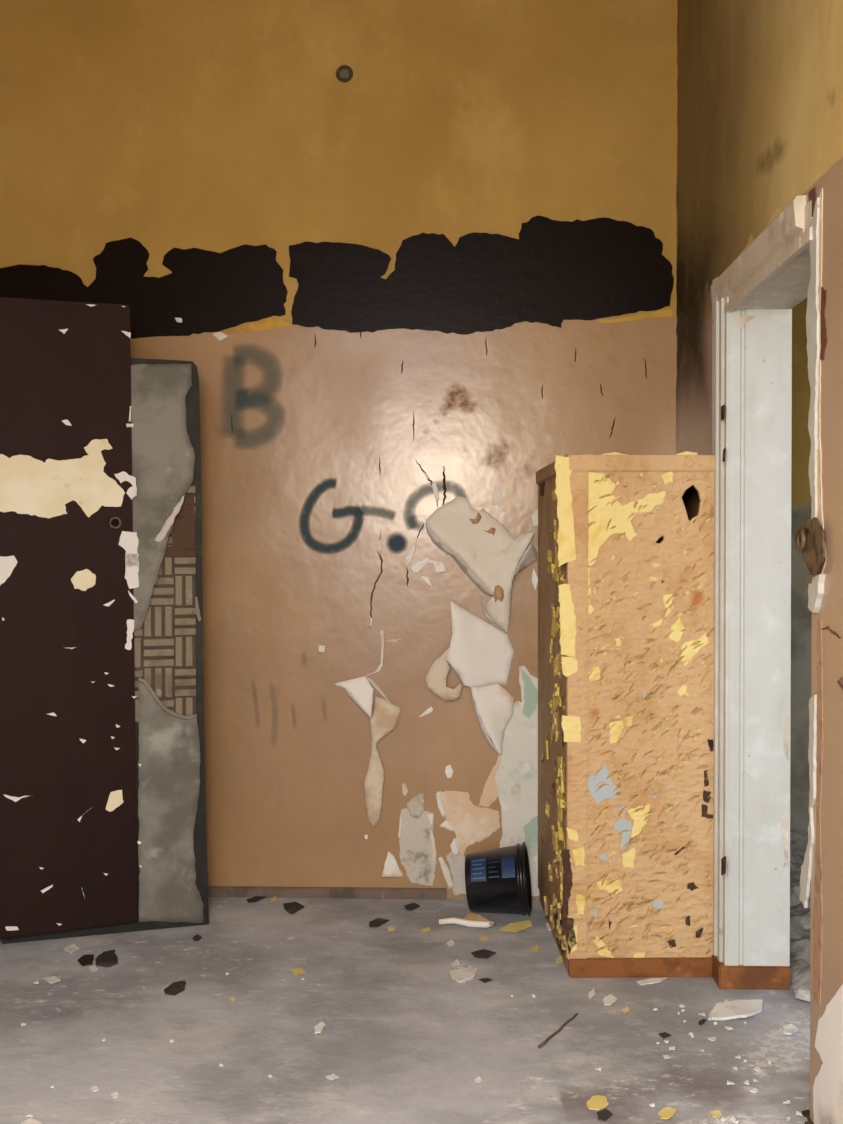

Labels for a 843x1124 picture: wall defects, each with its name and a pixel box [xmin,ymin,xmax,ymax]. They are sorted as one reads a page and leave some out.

peeling [0,439,137,518]
crack [415,459,447,507]
crack [366,533,407,676]
peeling [396,524,446,587]
flaking render [382,666,539,896]
flaking render [813,619,843,1124]